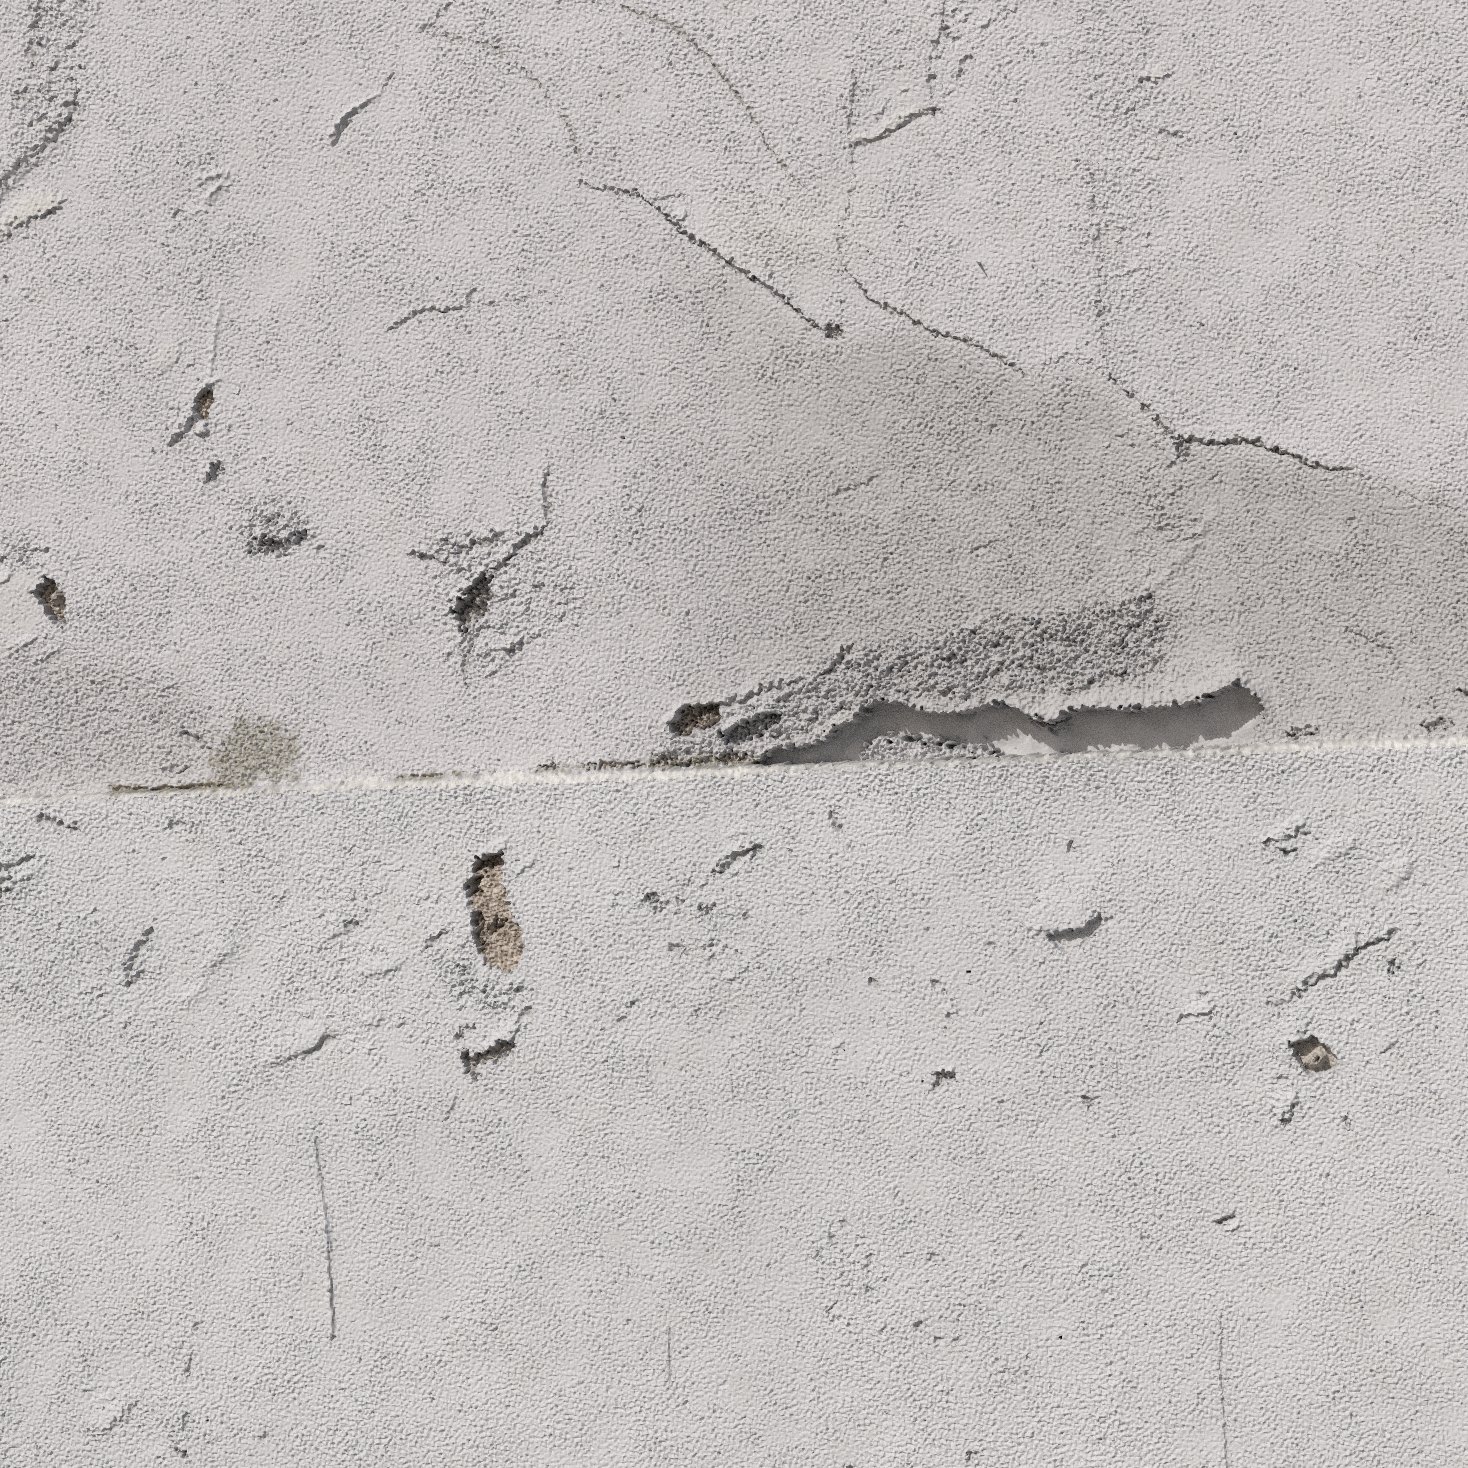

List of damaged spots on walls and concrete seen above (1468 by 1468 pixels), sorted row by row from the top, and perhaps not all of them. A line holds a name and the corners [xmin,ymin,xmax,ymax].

crack [323,71,398,152]
crack [382,285,571,336]
crack [417,0,1468,516]
spalling [822,473,883,503]
peeling [0,516,71,667]
hole [392,463,616,725]
spalling [641,495,1456,772]
peeling [1428,671,1468,704]
spalling [319,906,364,943]
spalling [357,830,546,1127]
hole [1268,1013,1344,1130]